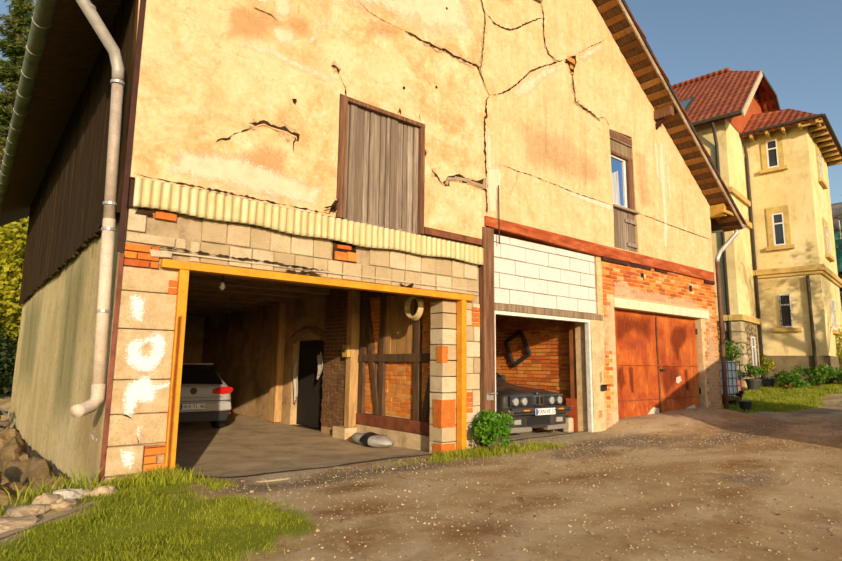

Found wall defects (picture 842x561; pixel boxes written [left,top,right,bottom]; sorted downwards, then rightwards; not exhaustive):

crack [212,117,300,151]
crack [359,0,611,213]